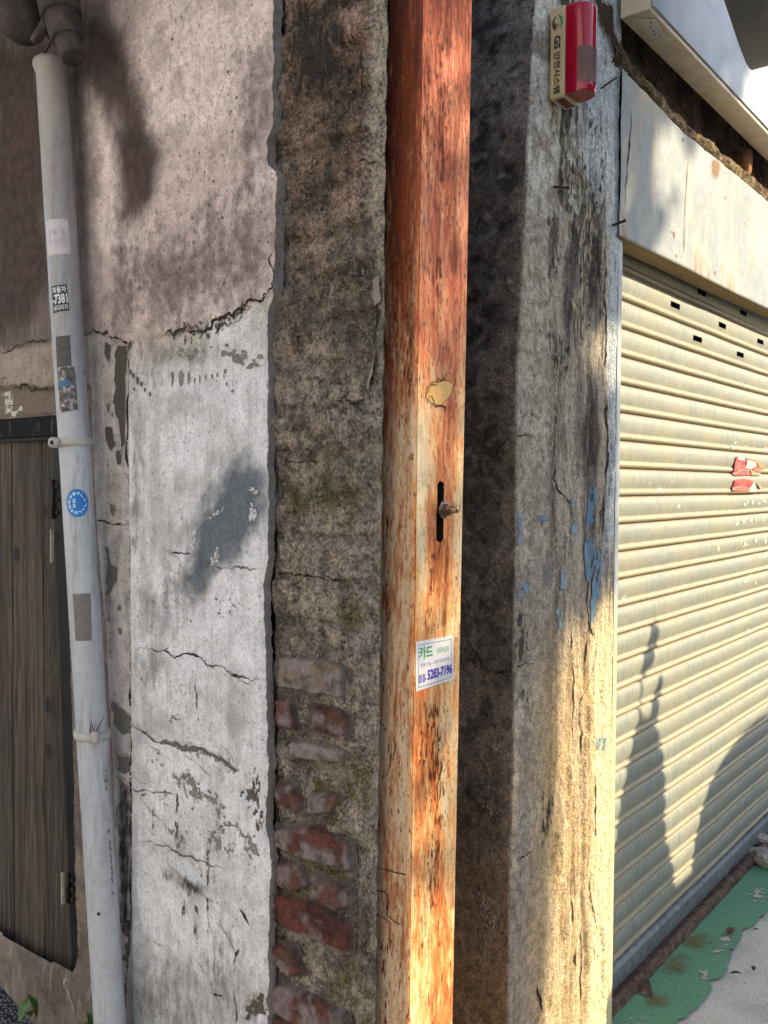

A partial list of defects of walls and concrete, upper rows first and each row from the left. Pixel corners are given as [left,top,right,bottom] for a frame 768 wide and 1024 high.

water stain [83,21,154,219]
water stain [547,108,607,297]
crack [161,248,275,344]
crack [0,338,55,393]
peeling [104,341,151,466]
peeling [171,343,263,392]
water stain [543,318,570,391]
crack [84,329,280,919]
water stain [187,563,208,595]
crack [171,529,347,644]
spalling [274,654,356,767]
spalling [151,752,359,1024]